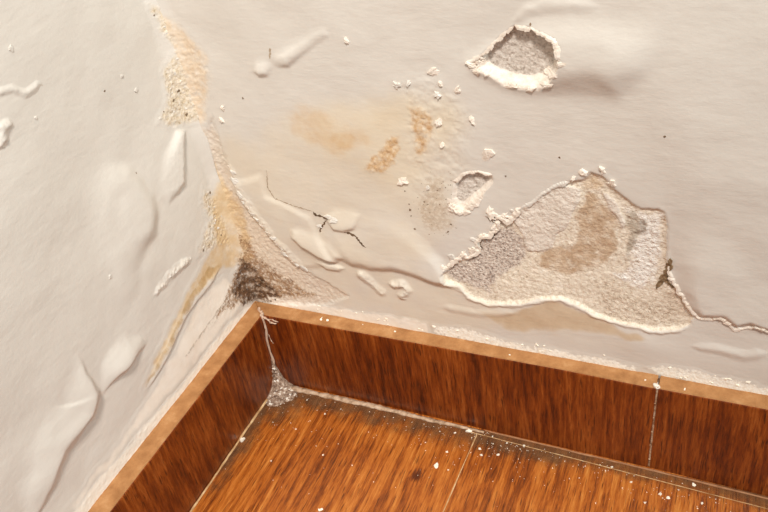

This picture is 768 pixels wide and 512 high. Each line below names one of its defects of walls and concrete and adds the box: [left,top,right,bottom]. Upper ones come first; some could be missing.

peeling [465,24,566,92]
crack [266,171,328,232]
damp [276,62,486,245]
peeling [438,166,768,336]
crack [656,259,674,289]
damp [61,226,768,512]